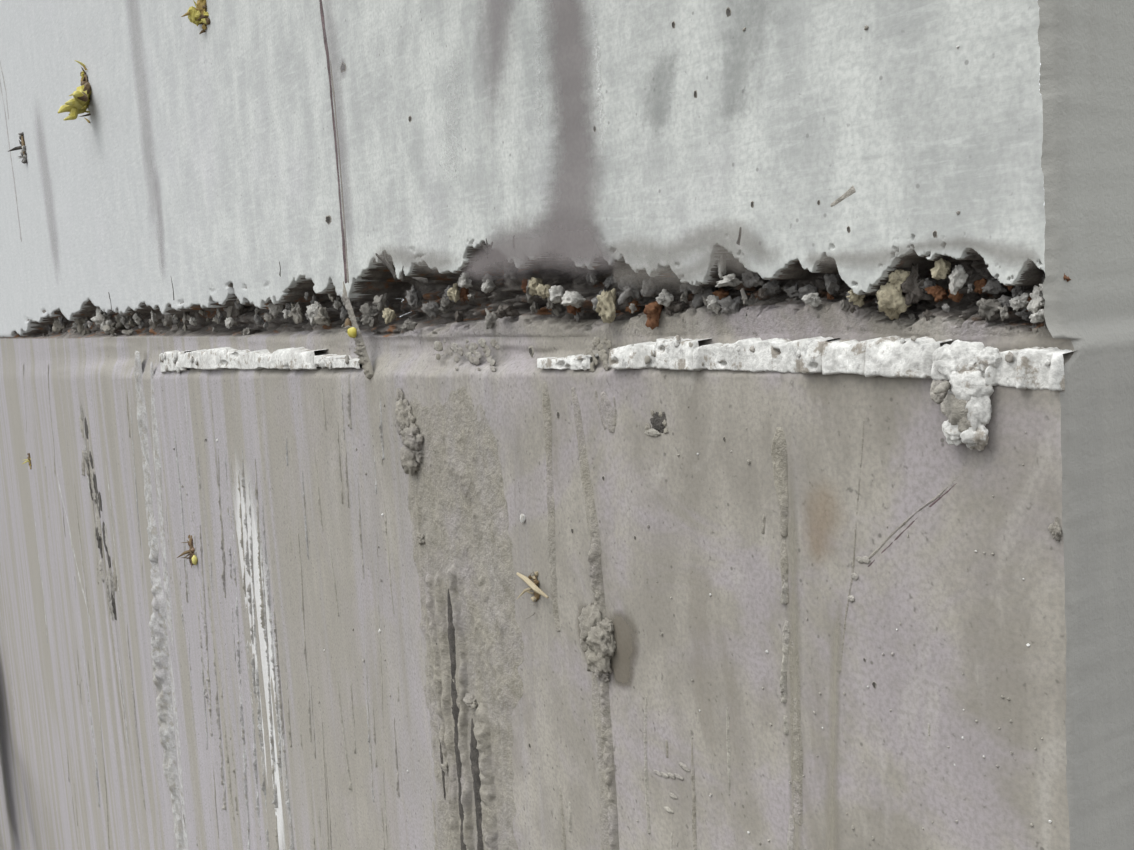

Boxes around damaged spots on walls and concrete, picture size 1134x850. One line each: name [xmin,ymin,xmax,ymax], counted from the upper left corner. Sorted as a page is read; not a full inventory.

water stain [469,0,607,275]
water stain [134,351,189,850]
crack [839,419,959,672]